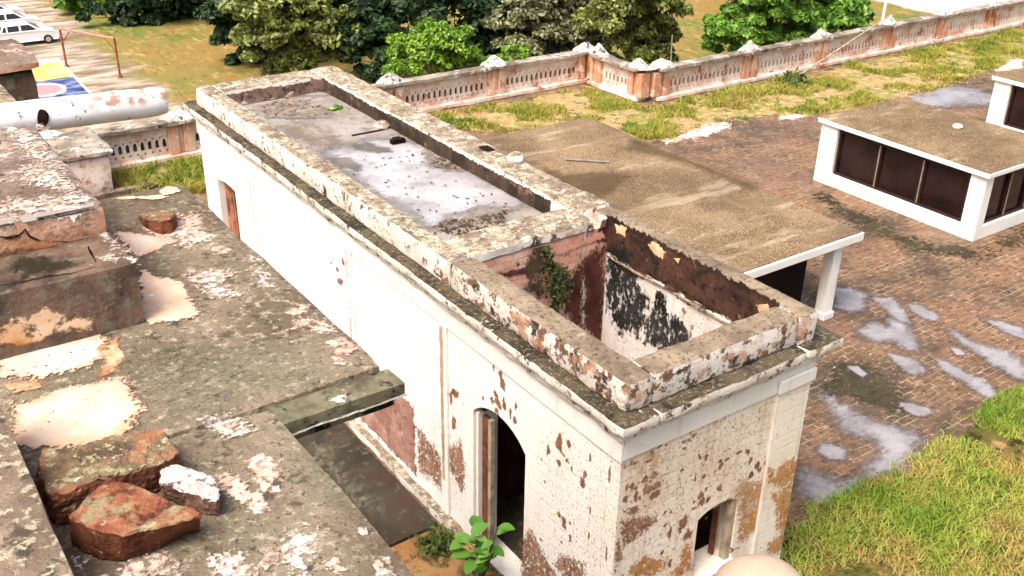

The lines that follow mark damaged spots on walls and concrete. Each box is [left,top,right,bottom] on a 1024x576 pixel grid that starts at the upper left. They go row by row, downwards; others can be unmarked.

crack [0,228,96,286]
flaking render [95,208,279,325]
leakage [500,265,528,277]
flaking render [648,241,680,264]
leakage [564,215,779,350]
flaking render [0,333,148,451]
flaking render [362,378,468,511]
peeling [482,364,517,424]
peeling [517,404,797,576]